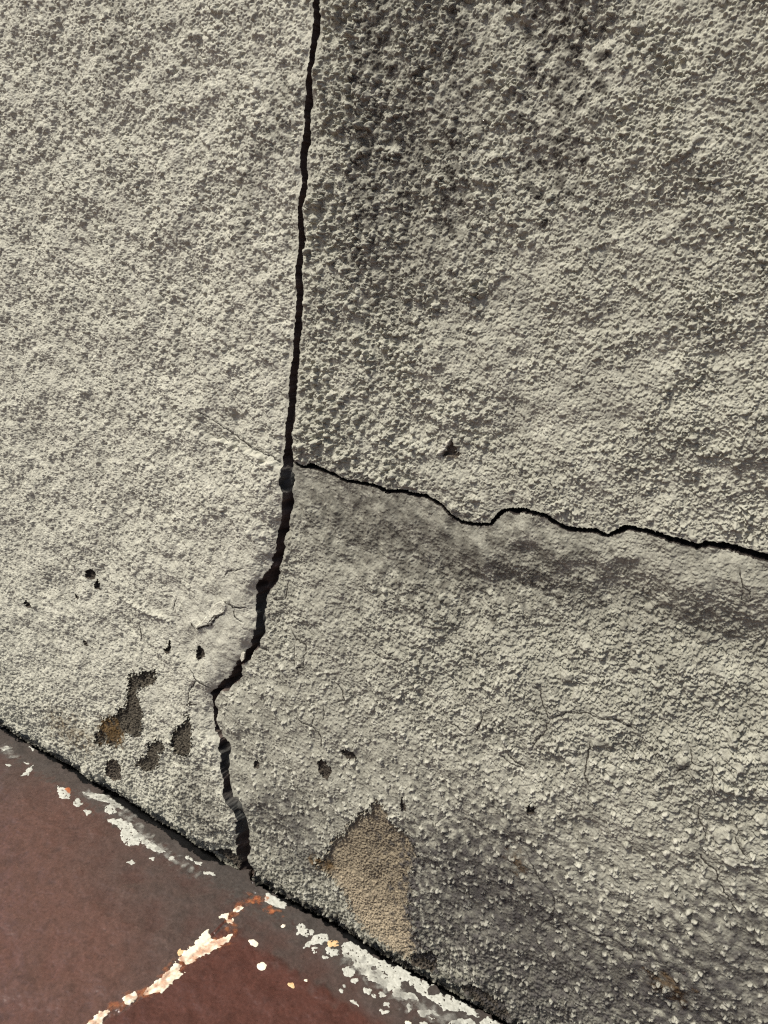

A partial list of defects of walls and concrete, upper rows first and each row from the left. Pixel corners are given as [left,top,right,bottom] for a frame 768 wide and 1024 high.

crack [173,0,768,877]
spalling [93,668,196,781]
spalling [296,798,512,1024]
crack [648,743,737,912]